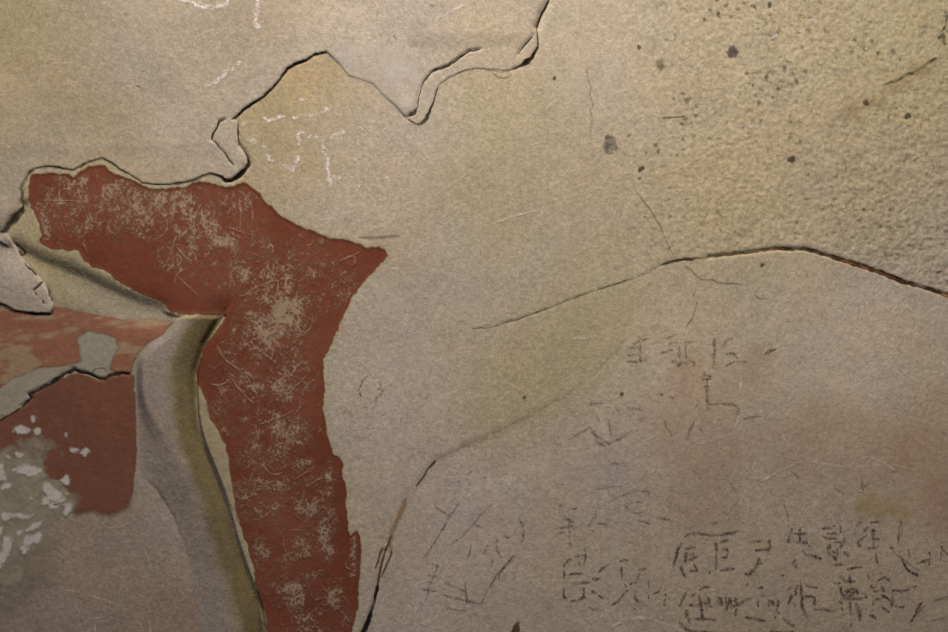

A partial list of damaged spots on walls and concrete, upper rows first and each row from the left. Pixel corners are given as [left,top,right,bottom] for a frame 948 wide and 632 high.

crack [888,15,948,83]
peeling [0,0,548,632]
crack [661,247,948,297]
crack [361,459,436,632]